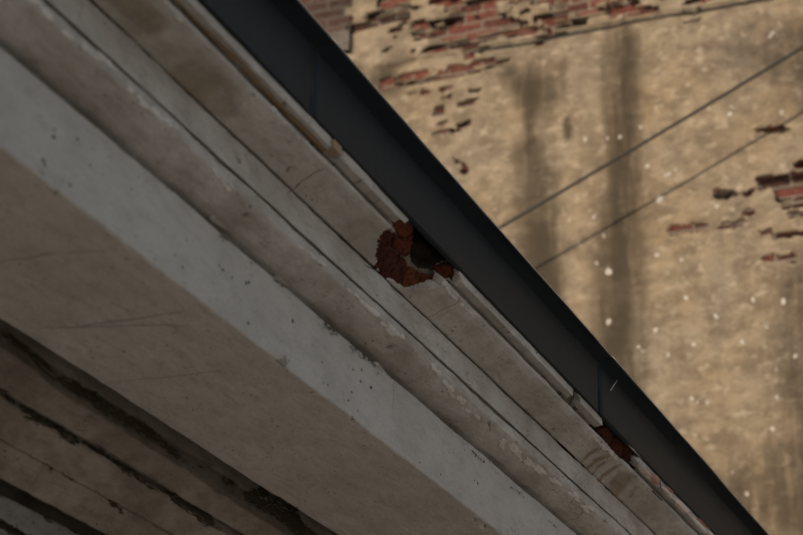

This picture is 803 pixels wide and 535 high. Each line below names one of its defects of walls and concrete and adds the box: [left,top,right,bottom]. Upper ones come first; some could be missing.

flaking render [354,0,660,137]
spalling [338,219,473,321]
leakage [505,69,559,295]
leakage [601,39,635,366]
spalling [666,209,755,237]
spalling [713,161,803,219]
spalling [761,253,798,264]
spalling [759,229,803,241]
leakage [0,334,181,460]
leakage [0,388,217,528]
spalling [589,421,714,535]